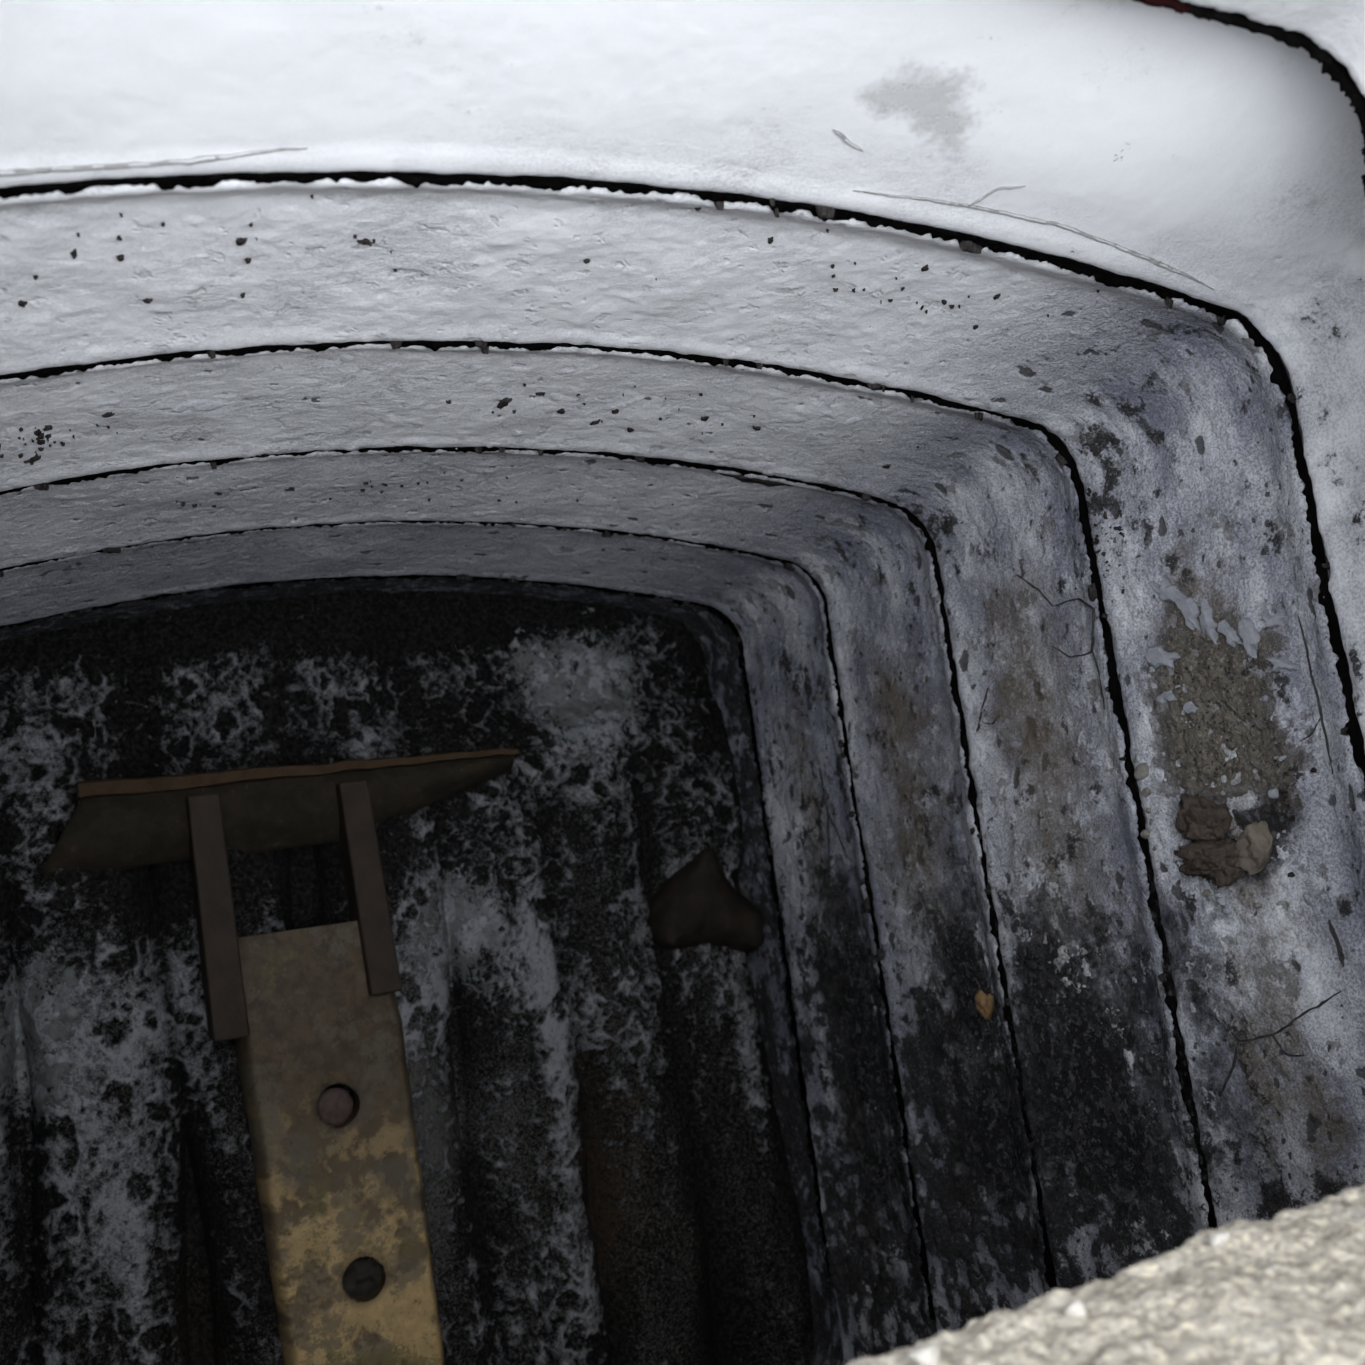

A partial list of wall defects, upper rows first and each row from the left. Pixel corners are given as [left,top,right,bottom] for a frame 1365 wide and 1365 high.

crack [1134,0,1365,194]
spalling [236,222,257,264]
spalling [353,234,376,246]
hole [0,425,75,465]
efflorescence [512,756,541,782]
efflorescence [493,607,645,774]
crack [0,340,1345,1354]
spalling [1141,579,1317,833]
efflorescence [399,863,524,1014]
water stain [0,938,109,1129]